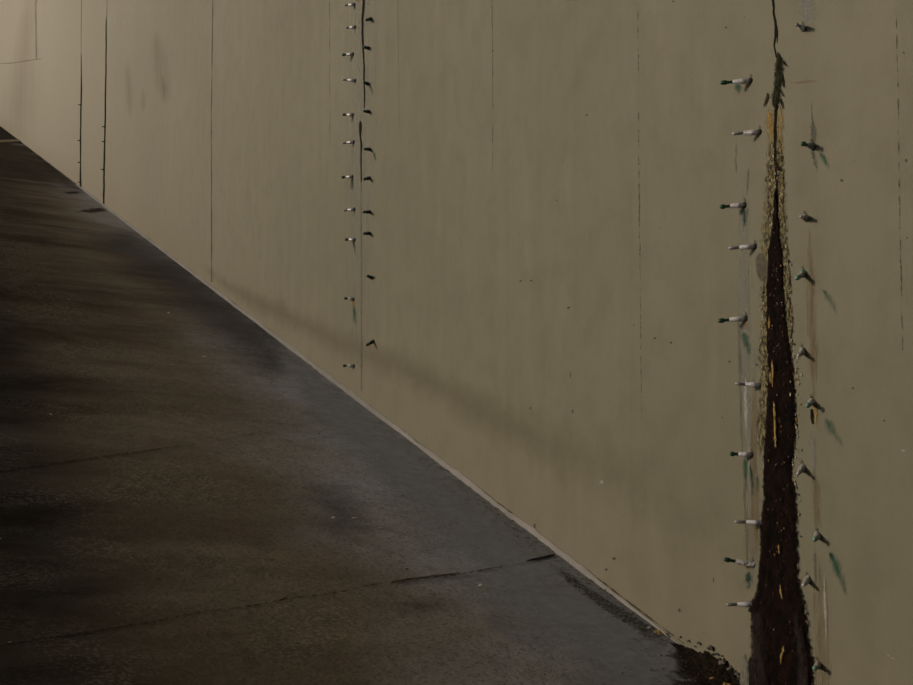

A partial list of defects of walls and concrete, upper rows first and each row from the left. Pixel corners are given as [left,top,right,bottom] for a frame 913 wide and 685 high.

crack [358,0,366,182]
crack [771,0,779,57]
crack [773,102,781,243]
leakage [738,136,816,685]
crack [0,565,504,646]
crack [526,554,555,562]